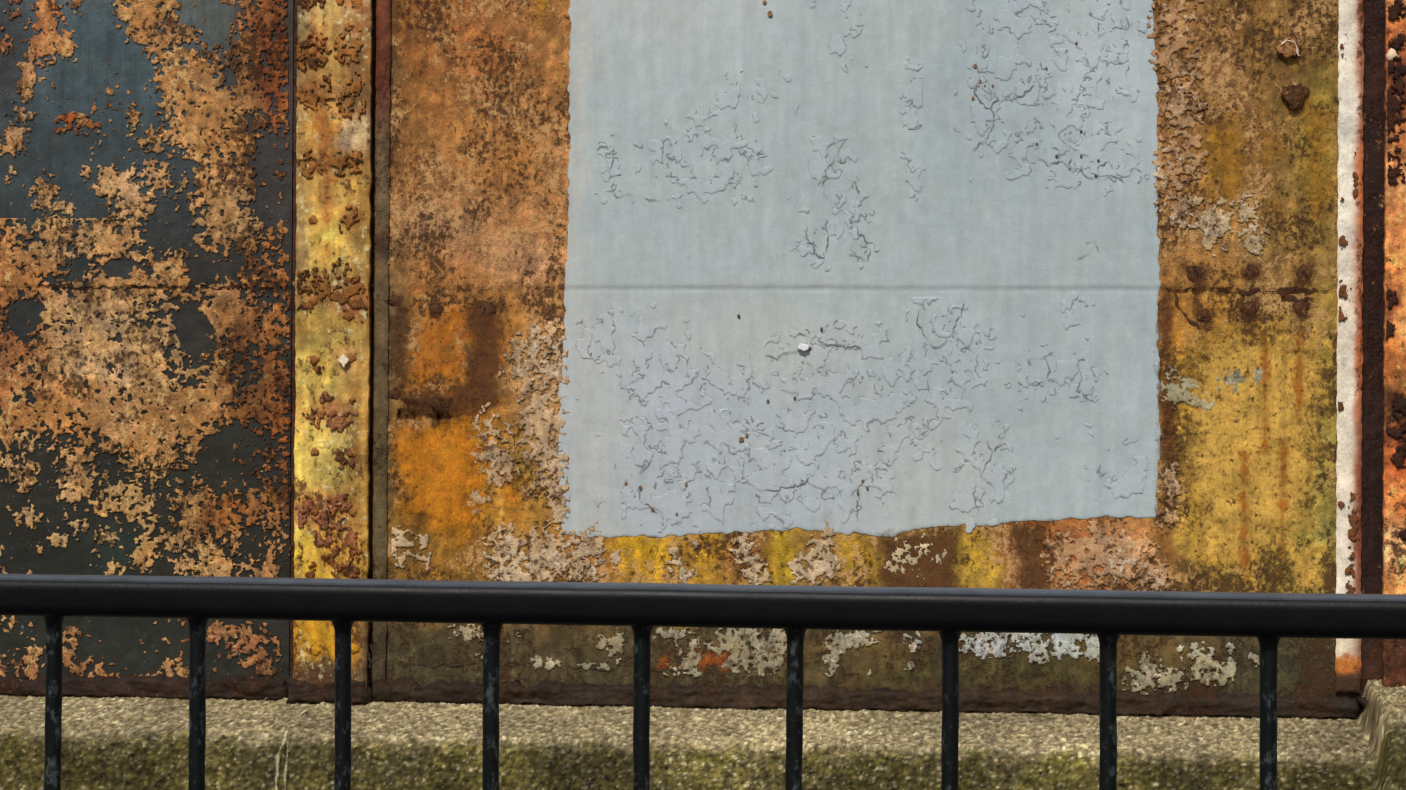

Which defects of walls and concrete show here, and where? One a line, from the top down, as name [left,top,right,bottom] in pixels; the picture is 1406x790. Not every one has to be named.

rust [295,0,366,233]
crack [598,75,764,203]
crack [900,0,1147,201]
peeling [0,0,292,577]
rust [296,245,368,322]
rust [302,391,358,469]
peeling [466,316,622,582]
crack [575,299,1108,532]
crack [1096,438,1137,498]
rust [298,493,363,579]
peeling [652,627,787,678]
peeling [959,632,1100,665]